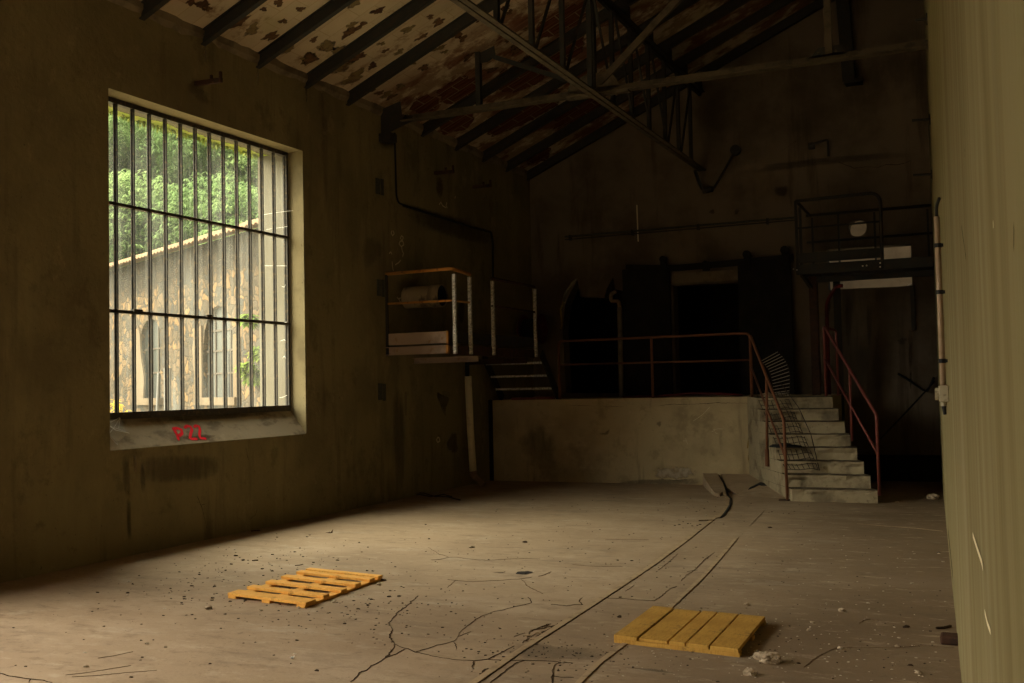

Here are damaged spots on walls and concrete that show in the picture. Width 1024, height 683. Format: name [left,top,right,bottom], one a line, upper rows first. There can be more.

peeling [186,0,213,12]
peeling [230,0,287,41]
peeling [300,6,386,66]
peeling [331,41,404,85]
crack [615,555,711,601]
crack [350,547,615,683]